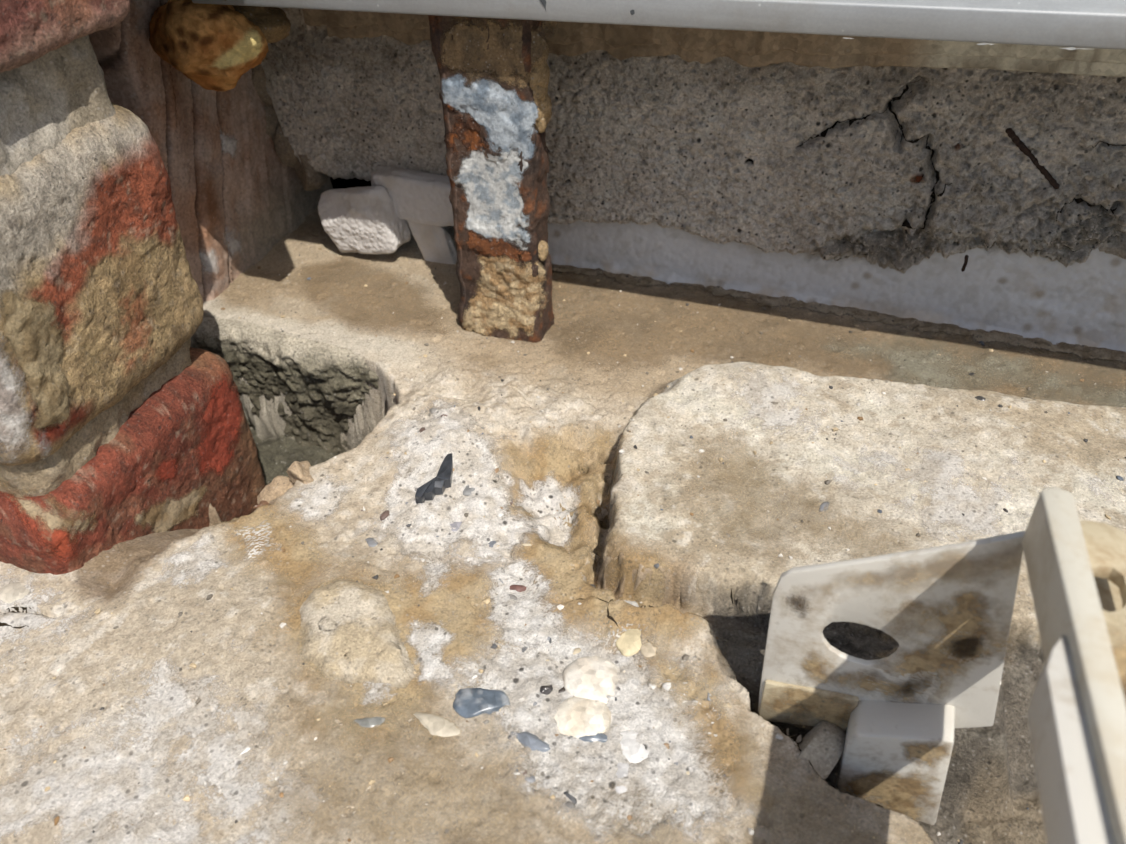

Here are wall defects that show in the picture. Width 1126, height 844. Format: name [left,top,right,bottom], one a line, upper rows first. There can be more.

rust [446,104,486,156]
crack [797,80,952,230]
crack [1056,198,1118,222]
rust [466,231,532,262]
spalling [164,535,222,587]
spalling [190,317,734,840]
peeling [0,569,91,662]
crack [576,598,618,626]
peeling [0,658,324,844]